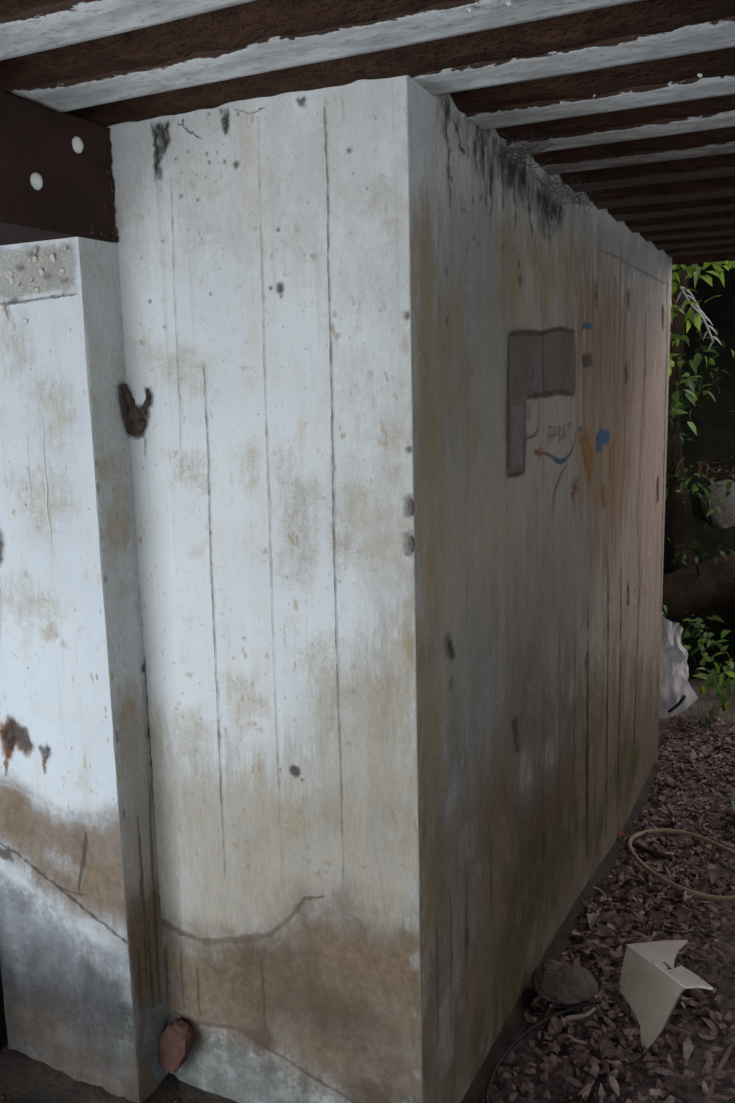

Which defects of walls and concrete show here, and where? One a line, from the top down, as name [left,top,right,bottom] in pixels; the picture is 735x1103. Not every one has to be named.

damp [152,122,201,178]
damp [444,102,469,153]
damp [474,126,563,227]
damp [0,195,671,1103]
corrosion [0,717,50,776]